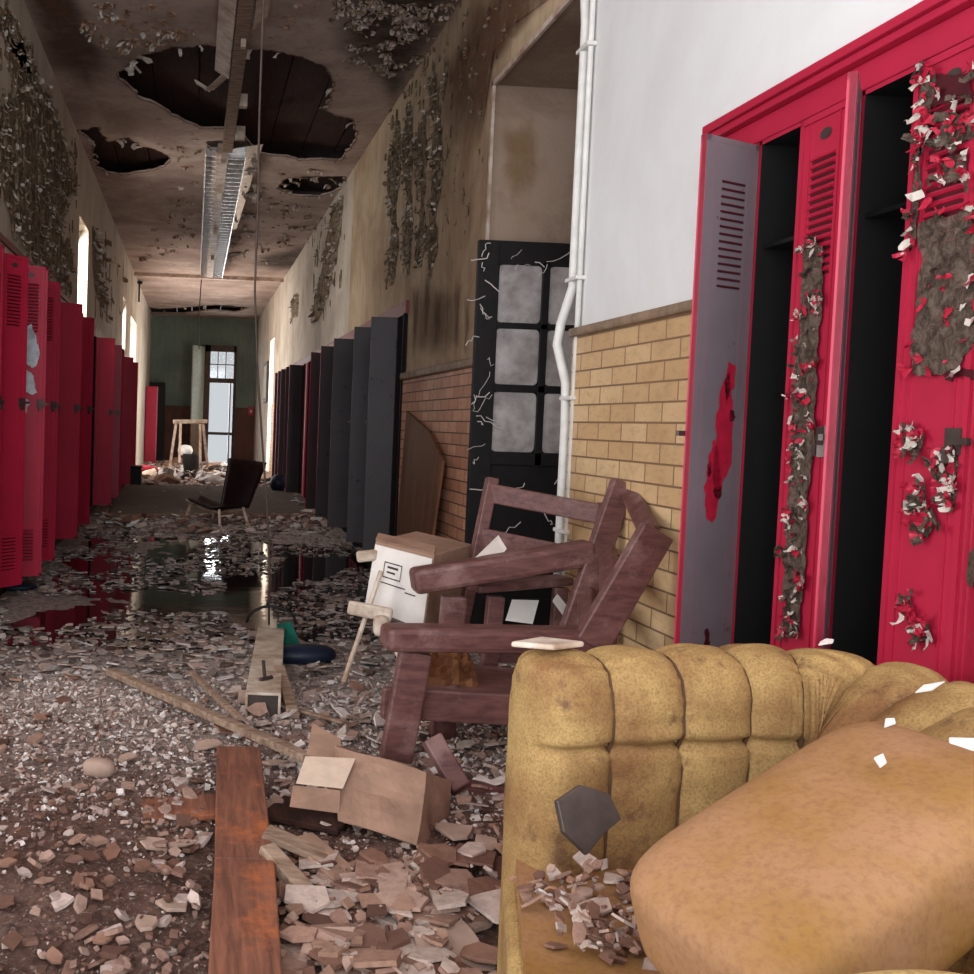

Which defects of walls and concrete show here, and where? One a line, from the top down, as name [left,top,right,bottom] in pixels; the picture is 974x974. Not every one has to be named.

peeling [0,0,224,296]
peeling [92,181,198,323]
peeling [226,48,358,325]
peeling [325,0,517,290]
peeling [892,59,974,379]
peeling [773,233,824,642]
peeling [889,588,933,652]
peeling [893,421,959,546]